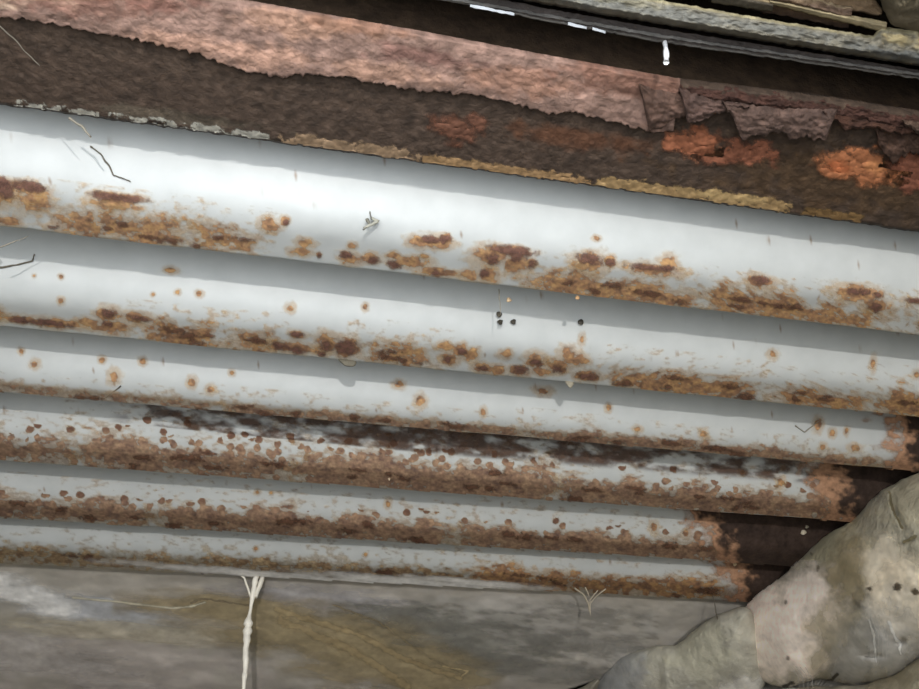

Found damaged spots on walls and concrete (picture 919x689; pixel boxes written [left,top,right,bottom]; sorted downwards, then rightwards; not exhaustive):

rust [0,0,919,193]
rust [16,99,865,223]
rust [0,177,256,252]
rust [261,216,290,232]
rust [289,238,322,258]
rust [339,233,892,330]
rust [0,307,430,367]
rust [437,336,599,381]
rust [0,368,919,602]
crack [191,598,249,606]